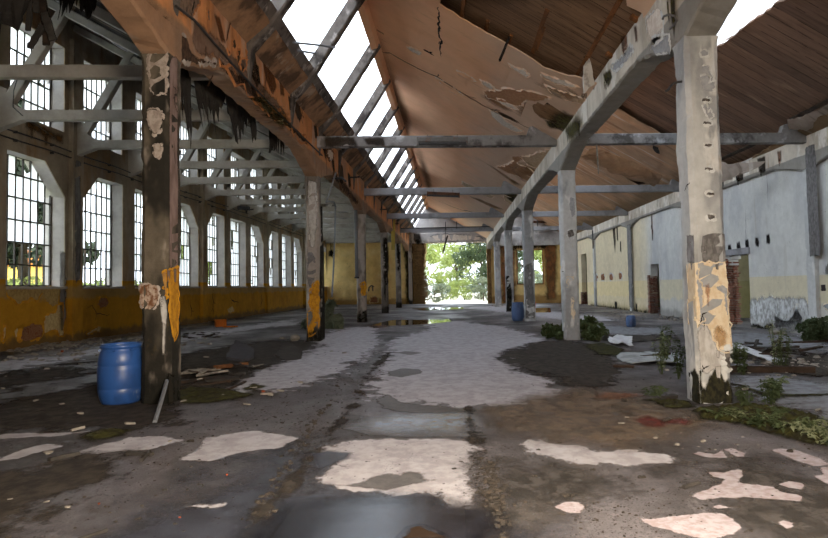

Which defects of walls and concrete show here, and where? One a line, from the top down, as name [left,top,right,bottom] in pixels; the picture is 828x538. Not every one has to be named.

peeling [146,52,170,96]
flaking render [181,32,308,145]
crack [383,7,528,128]
flaking render [456,70,586,110]
peeling [146,107,165,160]
flaking render [496,148,550,176]
peeling [1,286,65,344]
peeling [686,260,733,373]